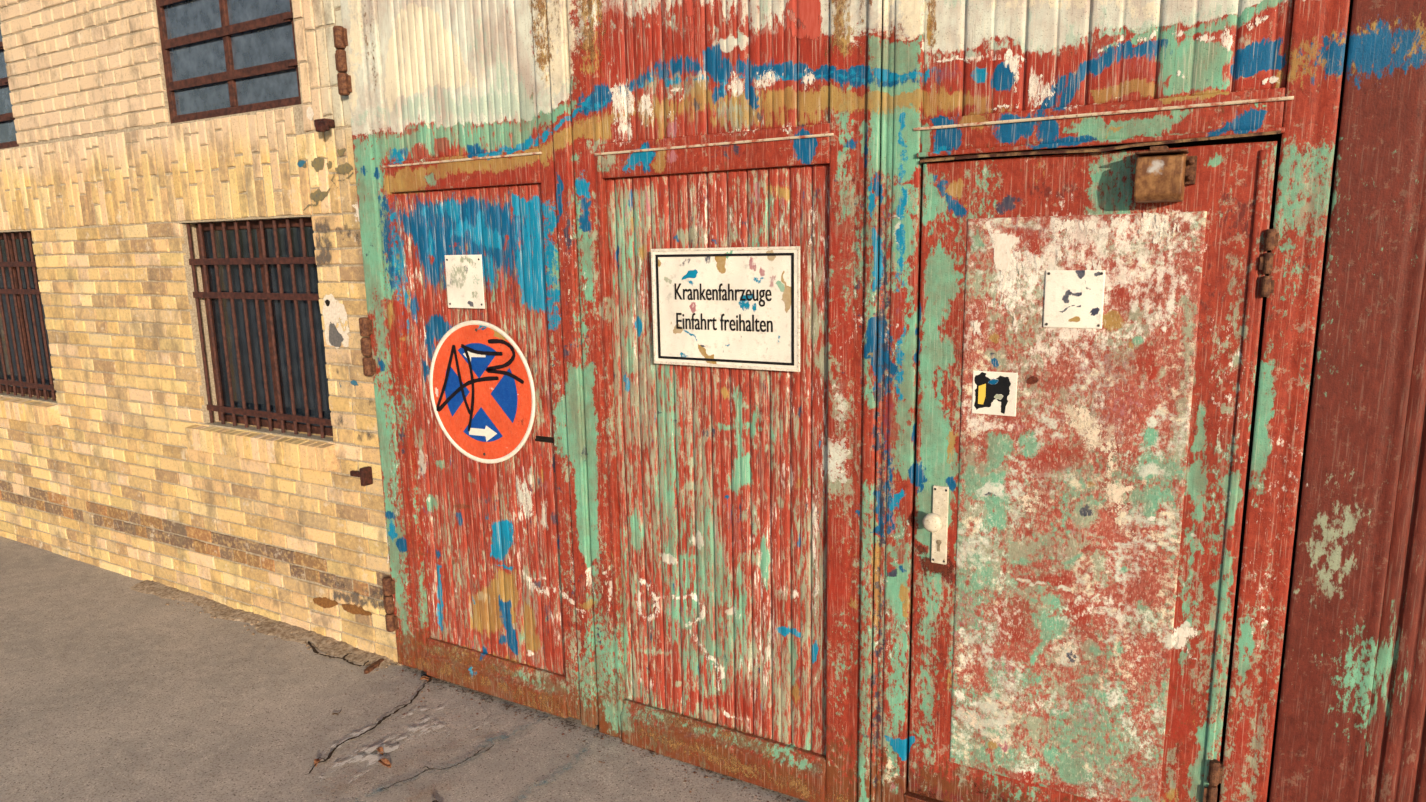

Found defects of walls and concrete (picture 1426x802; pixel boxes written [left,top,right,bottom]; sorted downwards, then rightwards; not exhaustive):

peeling [782,0,822,41]
peeling [1098,26,1232,53]
peeling [608,83,683,142]
peeling [728,70,779,96]
peeling [937,53,1056,111]
peeling [1051,210,1183,270]
peeling [985,221,1039,332]
peeling [1020,486,1048,512]
peeling [1046,399,1180,545]
peeling [636,580,720,688]
peeling [1170,626,1198,660]
crack [305,674,433,775]